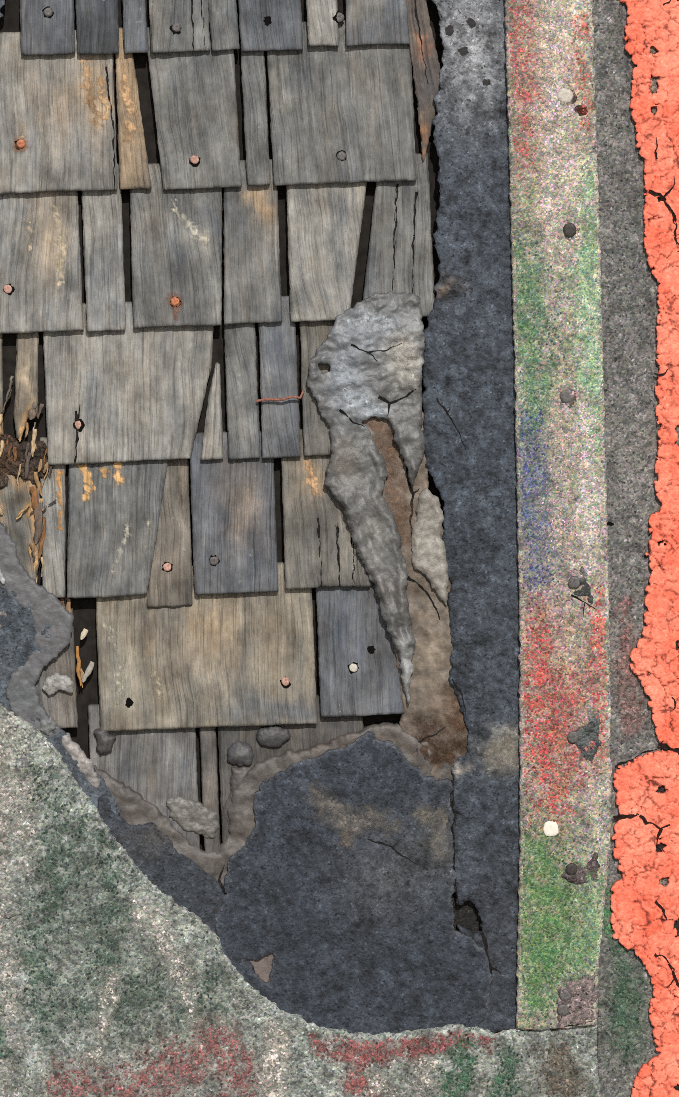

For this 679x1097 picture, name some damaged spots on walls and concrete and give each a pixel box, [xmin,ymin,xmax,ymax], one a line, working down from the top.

peeling [98,76,111,119]
crack [648,137,679,252]
peeling [99,462,124,485]
crack [615,743,679,768]
crack [613,813,670,852]
crack [654,953,679,988]